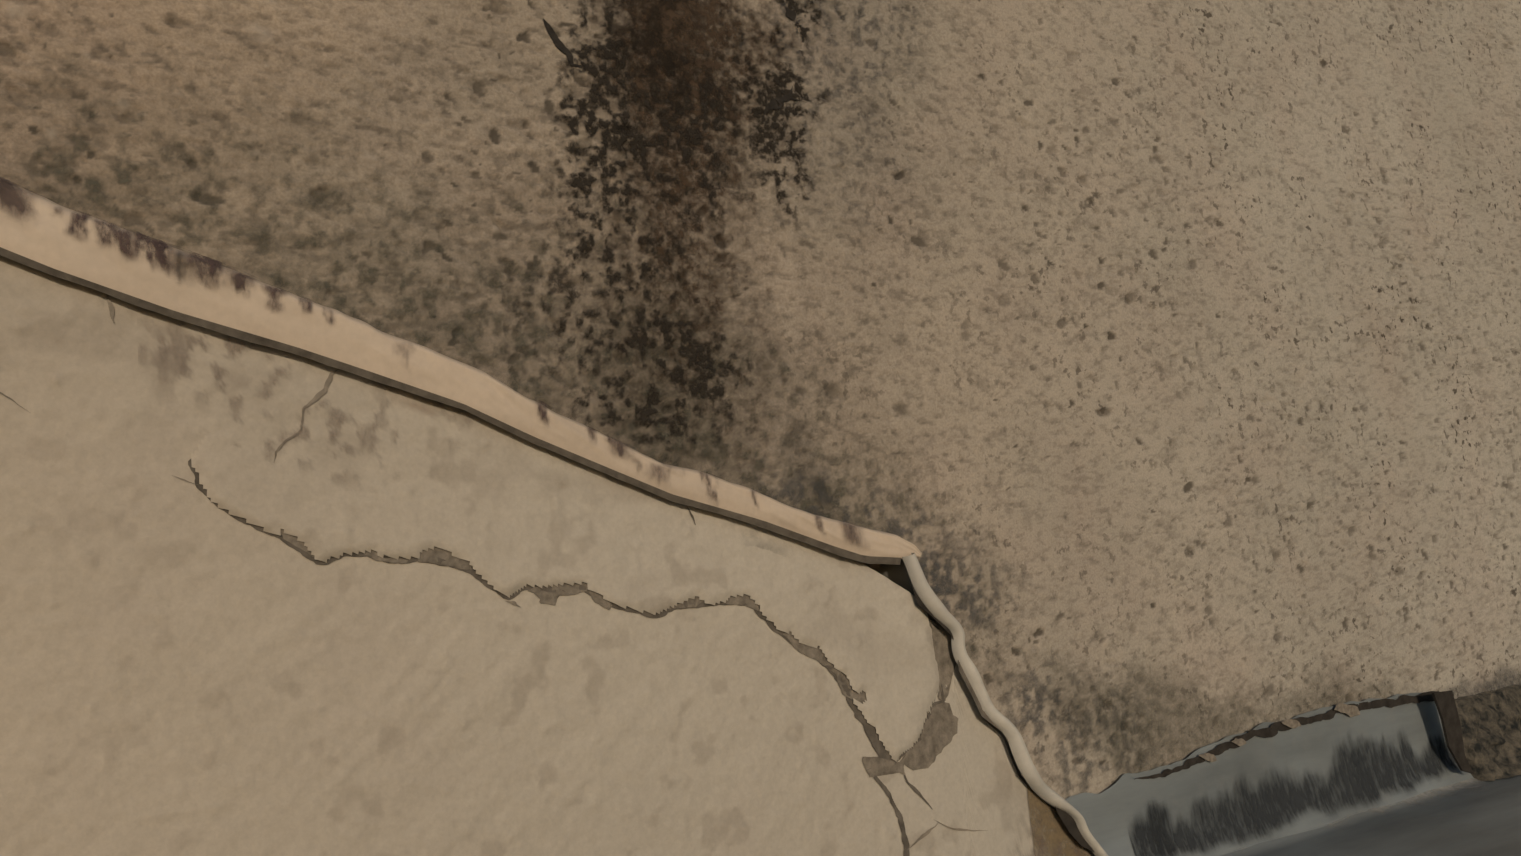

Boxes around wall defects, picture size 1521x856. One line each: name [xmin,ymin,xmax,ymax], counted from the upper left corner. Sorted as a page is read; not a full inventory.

water stain [0,179,27,213]
water stain [34,141,290,307]
water stain [296,0,912,539]
crack [274,369,339,462]
water stain [920,552,993,622]
crack [172,459,988,856]
water stain [1022,685,1184,788]